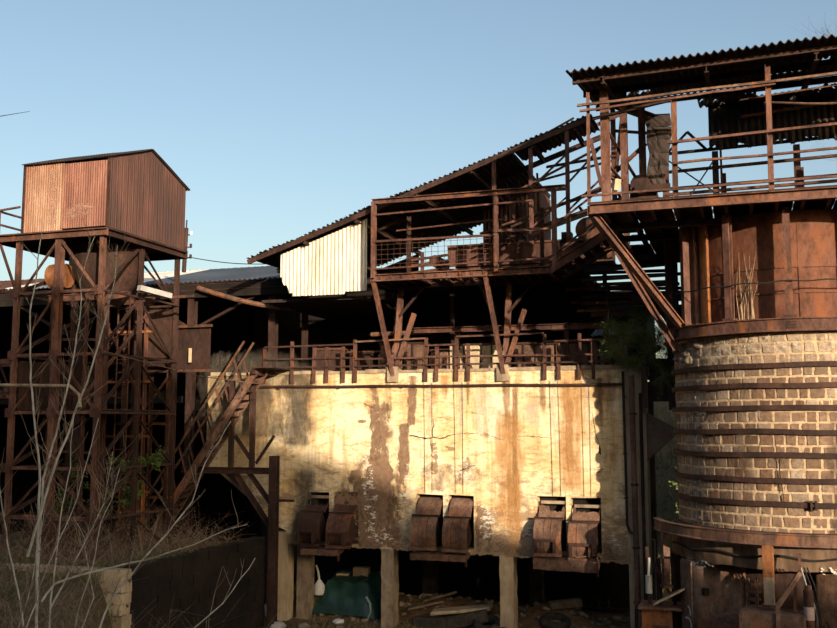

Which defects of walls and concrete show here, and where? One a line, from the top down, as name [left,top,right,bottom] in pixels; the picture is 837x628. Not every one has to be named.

water stain [335,387,417,548]
crack [398,412,546,449]
water stain [475,506,492,552]
corrosion [498,377,521,549]